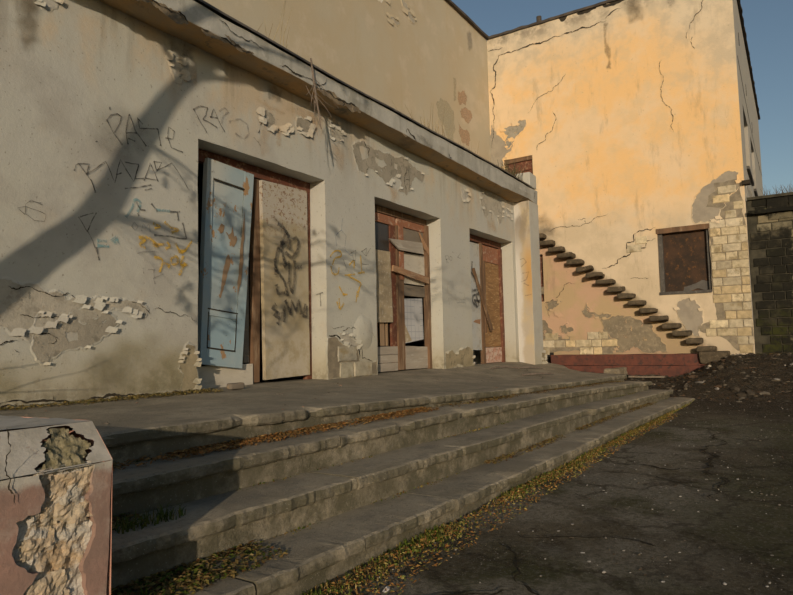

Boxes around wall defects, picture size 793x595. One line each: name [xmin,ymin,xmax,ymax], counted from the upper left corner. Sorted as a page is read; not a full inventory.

spalling [137,0,189,24]
crack [488,8,619,141]
flaking render [256,106,316,138]
flaking render [328,124,425,196]
flaking render [490,118,527,170]
flaking render [691,170,752,224]
crack [607,229,652,268]
flaking render [0,276,150,367]
flaking render [582,302,668,354]
flaking render [674,296,704,337]
spalling [12,428,94,595]